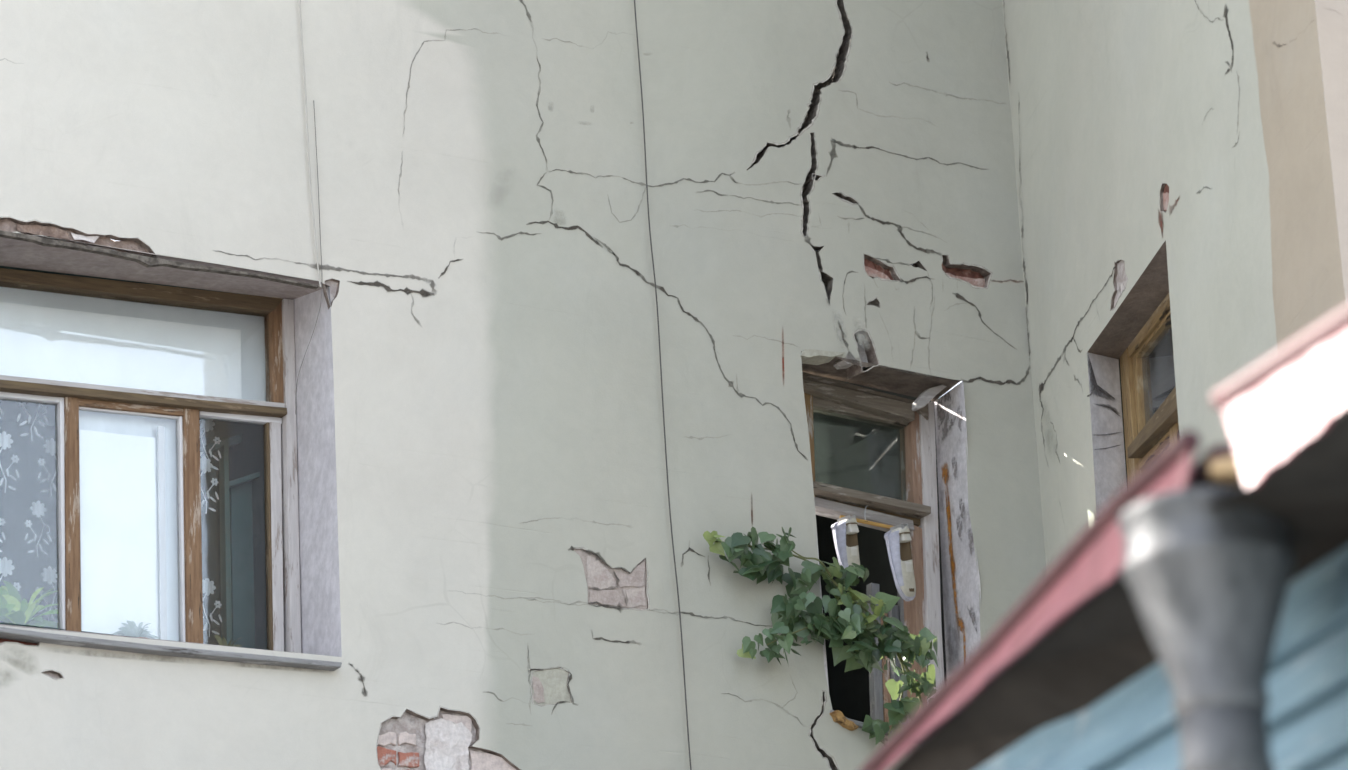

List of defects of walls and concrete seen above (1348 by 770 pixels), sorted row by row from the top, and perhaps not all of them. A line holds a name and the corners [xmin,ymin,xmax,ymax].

crack [1224,7,1233,73]
spalling [0,217,158,258]
crack [316,259,460,297]
crack [499,59,806,459]
crack [624,0,1121,450]
spalling [863,254,901,281]
spalling [942,254,992,289]
spalling [1159,183,1169,213]
peeling [570,546,650,611]
crack [594,605,630,643]
spalling [376,706,521,770]
crack [809,690,838,770]